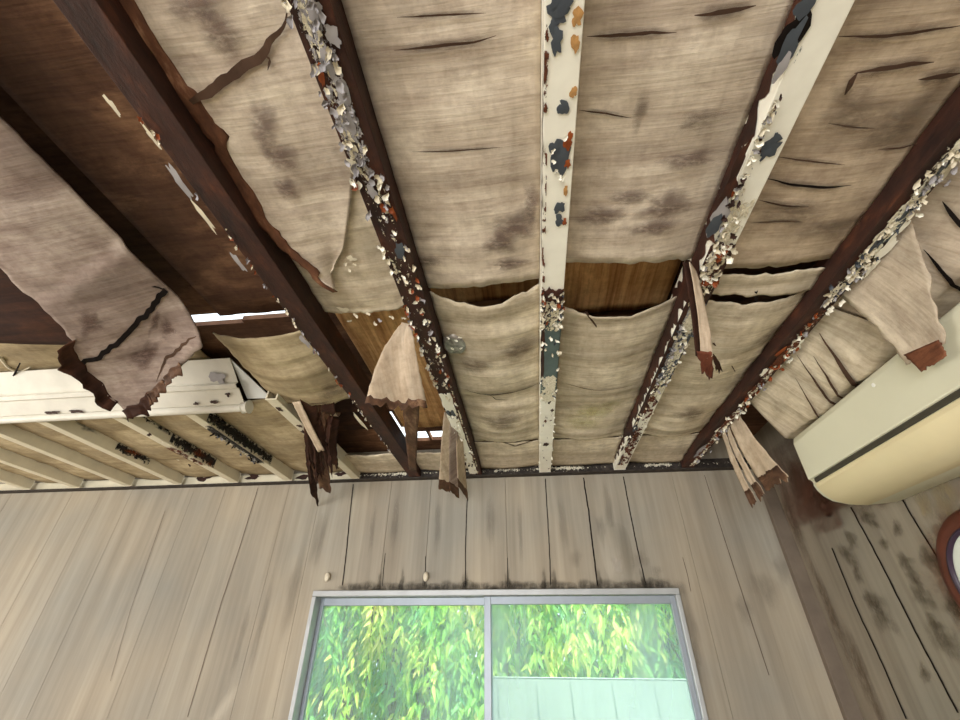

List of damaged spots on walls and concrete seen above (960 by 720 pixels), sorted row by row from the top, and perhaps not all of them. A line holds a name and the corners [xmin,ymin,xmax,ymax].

peeling [772,0,816,84]
crack [844,60,960,95]
peeling [137,116,162,150]
peeling [165,164,256,275]
peeling [281,0,589,474]
peeling [698,94,783,306]
peeling [263,283,319,355]
peeling [690,139,960,466]
peeling [618,300,693,467]
crack [795,333,860,418]
rust [115,443,150,464]
rust [144,417,217,482]